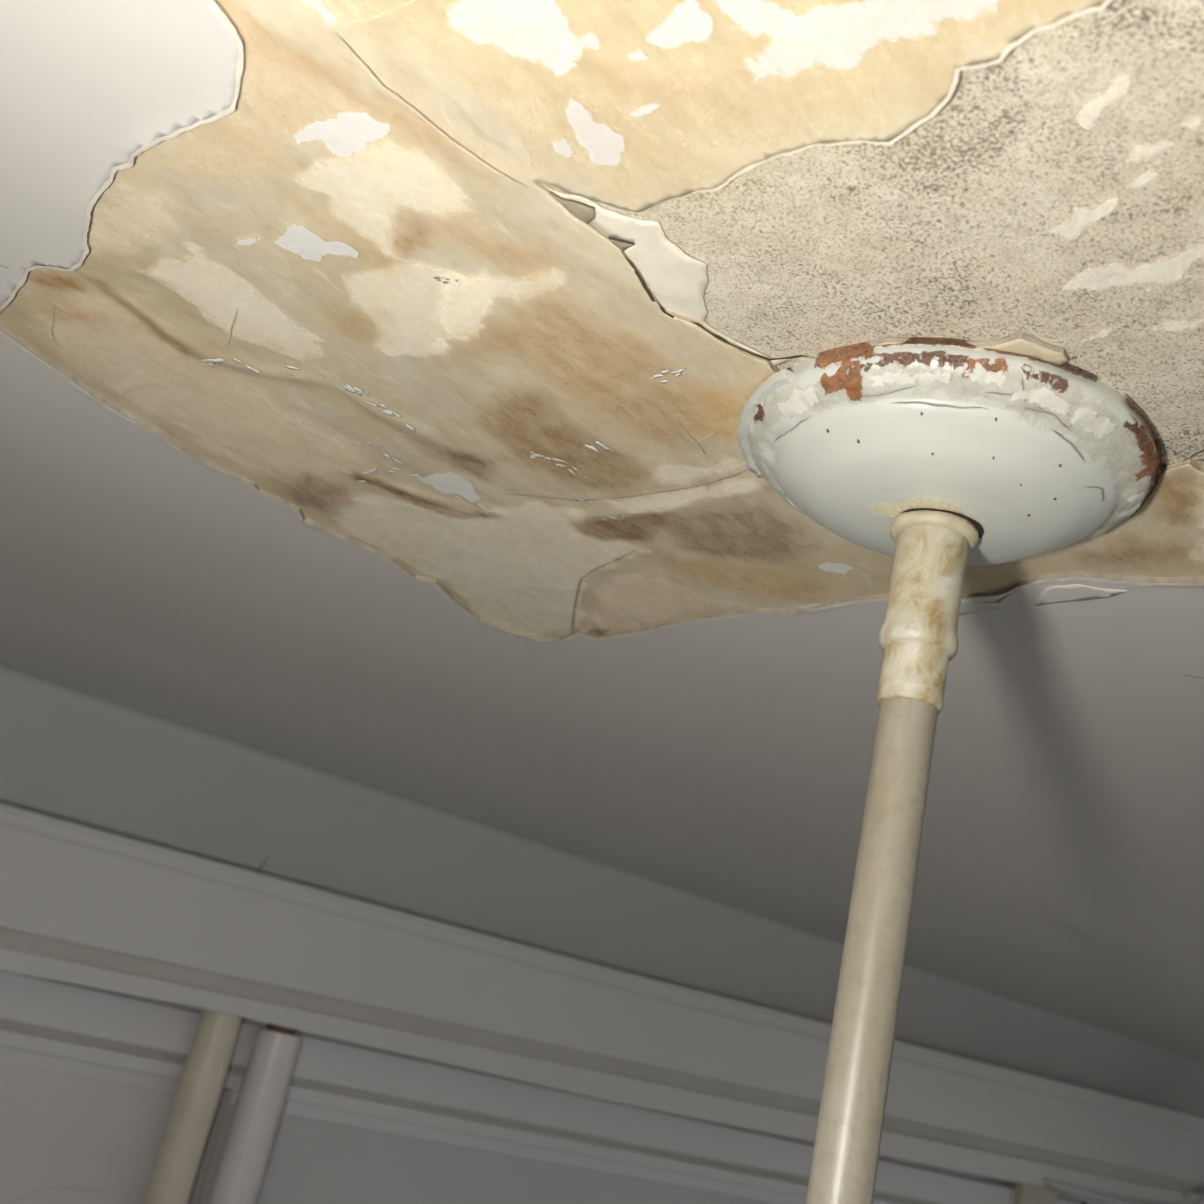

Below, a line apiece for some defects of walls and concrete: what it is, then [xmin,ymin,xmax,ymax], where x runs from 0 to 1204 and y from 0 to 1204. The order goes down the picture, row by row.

peeling [0,0,1204,643]
leakage [497,302,748,447]
leakage [287,475,354,510]
leakage [352,473,494,519]
leakage [429,444,489,477]
leakage [481,392,651,489]
leakage [574,505,820,596]